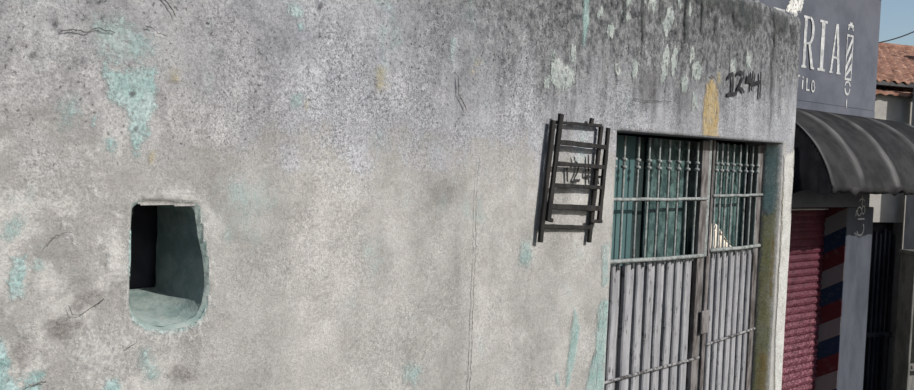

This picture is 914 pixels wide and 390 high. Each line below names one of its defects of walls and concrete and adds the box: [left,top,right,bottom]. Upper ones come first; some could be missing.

peeling [85,15,159,156]
peeling [544,0,632,90]
peeling [660,0,703,111]
damp [685,0,797,57]
peeling [786,0,803,15]
peeling [0,343,45,390]
peeling [75,334,134,390]
peeling [586,301,608,390]